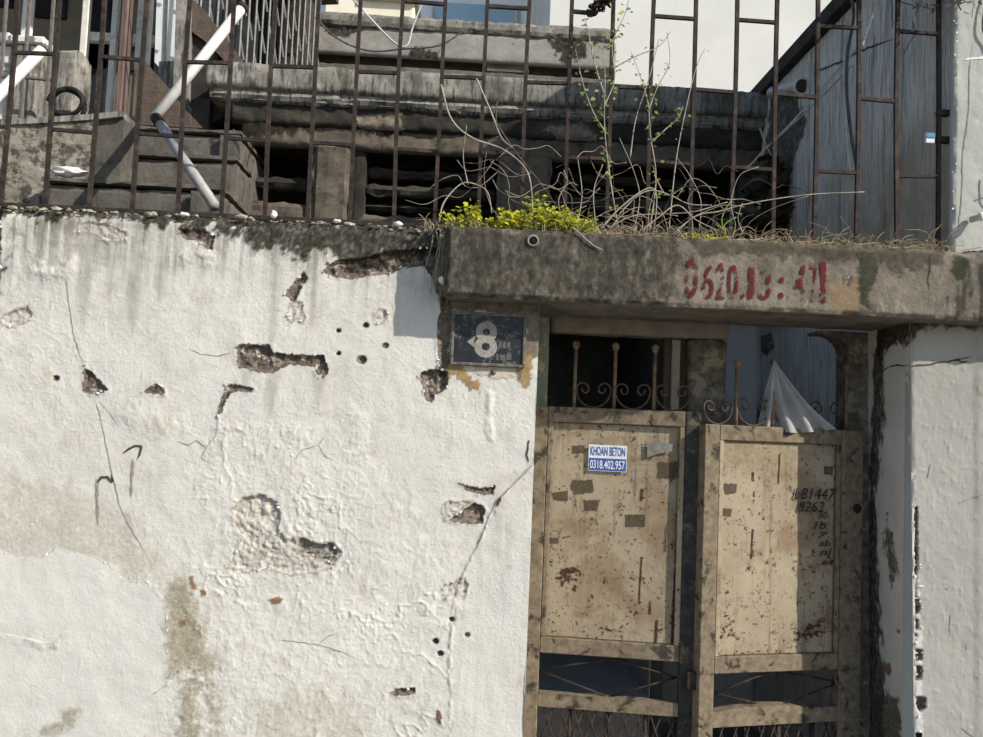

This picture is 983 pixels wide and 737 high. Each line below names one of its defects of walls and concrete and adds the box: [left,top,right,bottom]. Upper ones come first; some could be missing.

crack [66,283,84,364]
flaking render [82,365,108,394]
flaking render [235,343,329,378]
flaking render [322,247,534,403]
damp [440,226,678,358]
crack [876,356,973,372]
crack [93,396,153,567]
flaking render [228,493,343,576]
flaking render [441,483,496,524]
crack [455,440,532,596]
damp [689,238,983,737]
peeling [911,463,926,737]